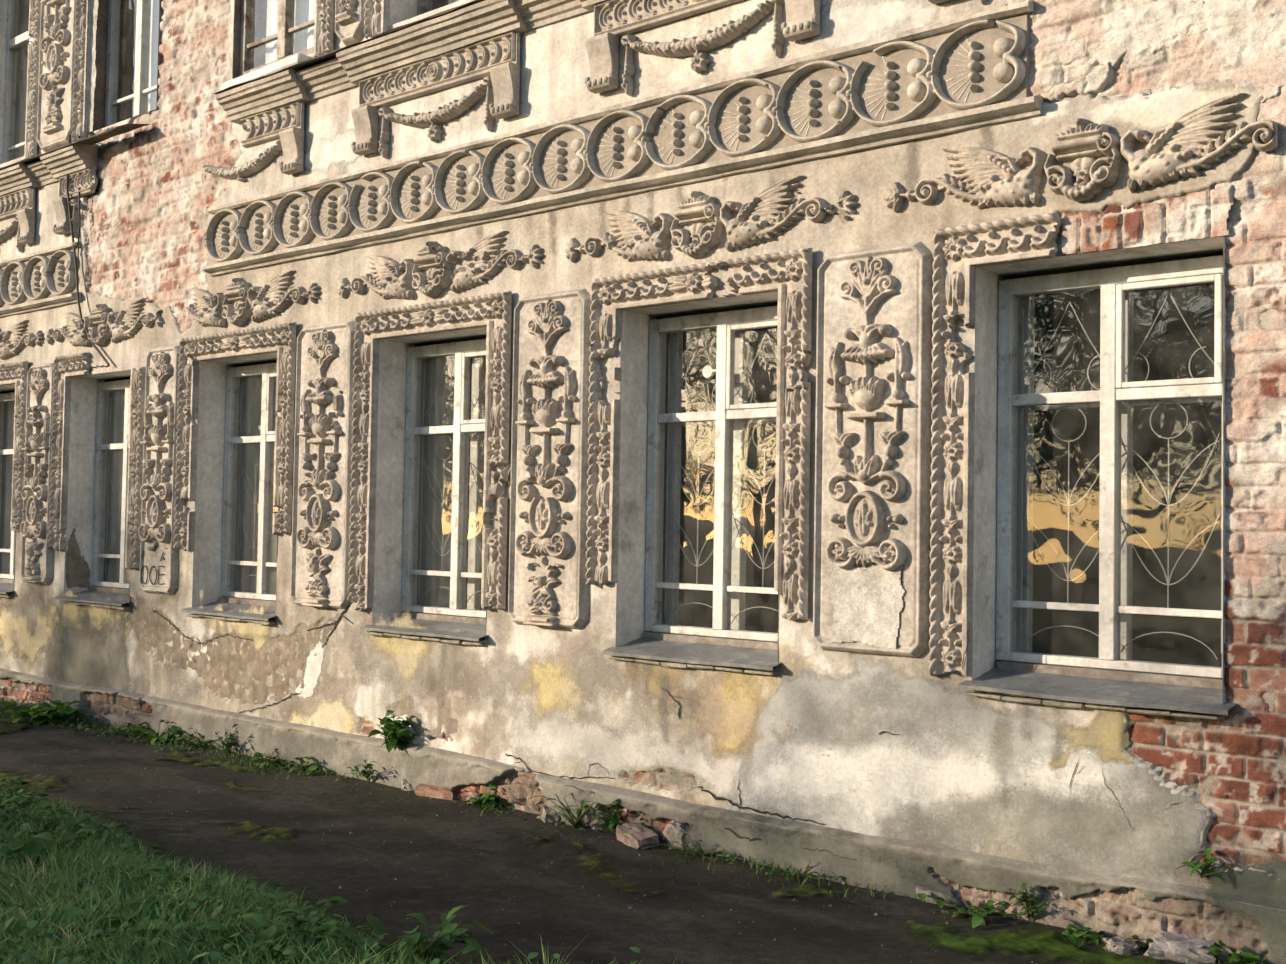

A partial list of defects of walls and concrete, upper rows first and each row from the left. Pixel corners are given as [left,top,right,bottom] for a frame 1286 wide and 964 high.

spalling [82,0,243,334]
spalling [1003,0,1286,867]
peeling [66,528,90,588]
damp [0,551,182,705]
crack [152,609,253,663]
peeling [127,591,336,705]
crack [239,688,299,713]
crack [306,605,353,646]
damp [356,620,668,741]
crack [505,753,613,779]
spalling [623,770,699,791]
crack [697,778,856,860]